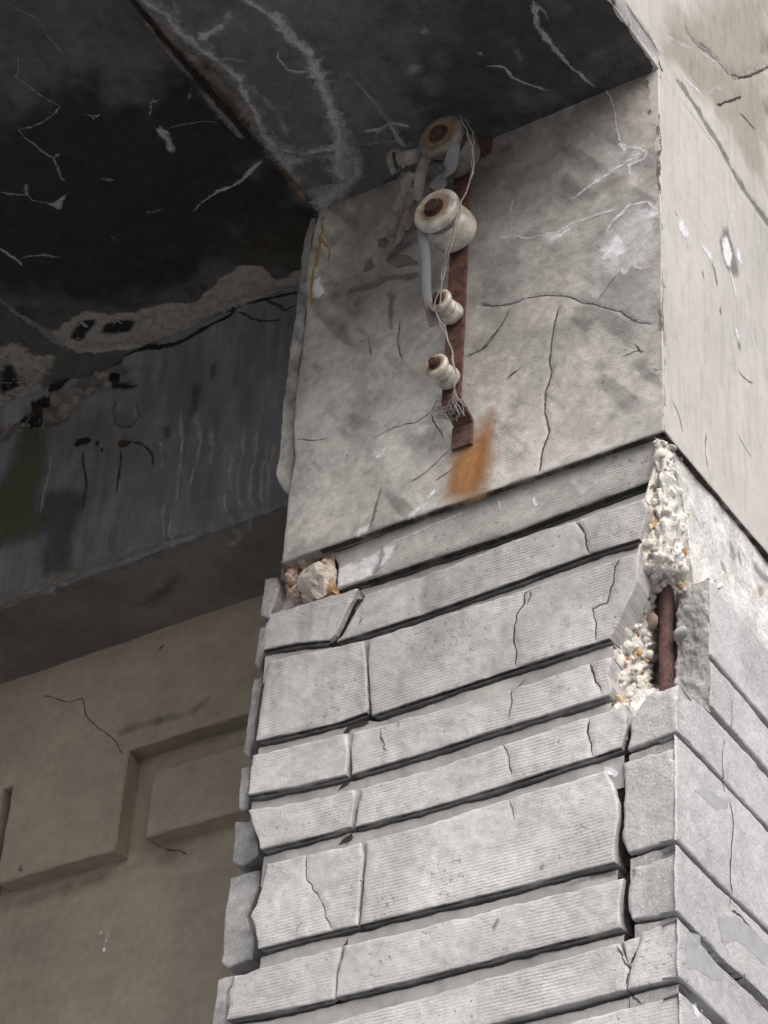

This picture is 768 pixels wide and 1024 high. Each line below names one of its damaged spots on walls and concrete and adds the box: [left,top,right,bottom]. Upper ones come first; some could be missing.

crack [2,57,65,210]
crack [194,160,262,211]
crack [666,30,768,225]
peeling [0,342,69,428]
peeling [52,265,302,389]
crack [376,401,456,481]
rust [455,437,487,493]
crack [467,276,651,472]
spalling [280,550,340,606]
spalling [606,438,725,720]
crack [508,590,532,718]
crack [296,857,348,946]